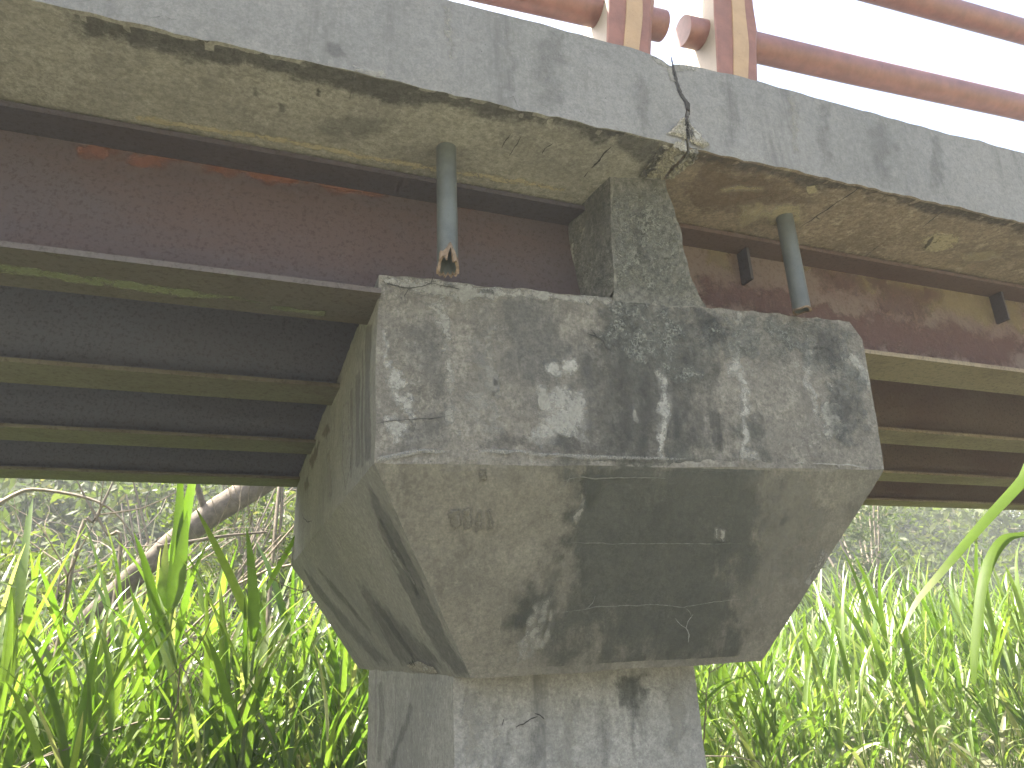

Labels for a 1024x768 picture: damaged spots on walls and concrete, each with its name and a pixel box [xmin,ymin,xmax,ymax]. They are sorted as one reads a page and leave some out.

leakage [354,66,385,77]
crack [671,57,695,145]
leakage [507,316,786,710]
crack [566,597,741,642]